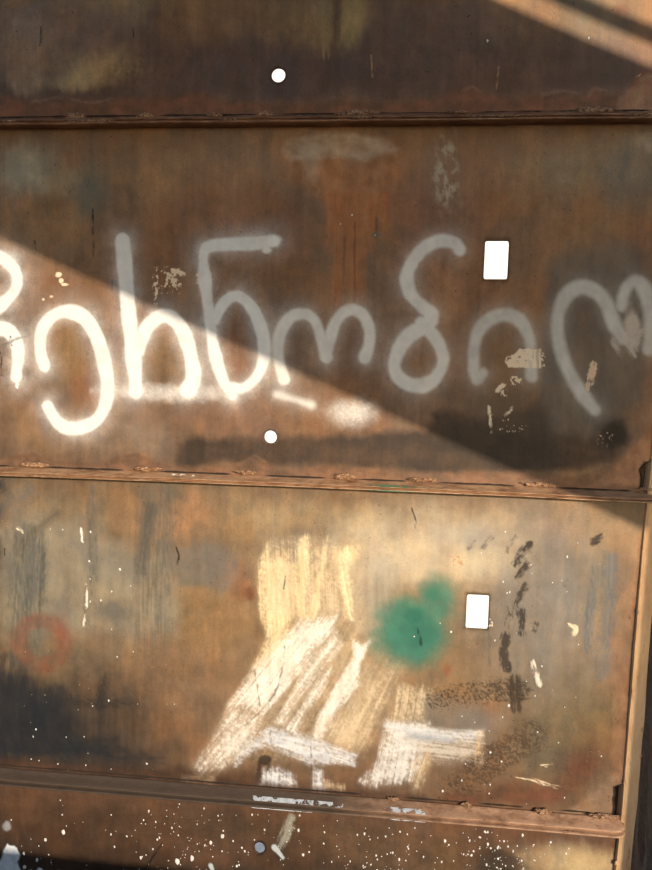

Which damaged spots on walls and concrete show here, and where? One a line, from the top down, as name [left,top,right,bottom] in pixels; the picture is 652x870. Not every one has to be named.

corrosion [613,68,652,111]
corrosion [266,129,417,291]
peeling [152,265,202,306]
peeling [487,347,546,434]
peeling [584,359,599,393]